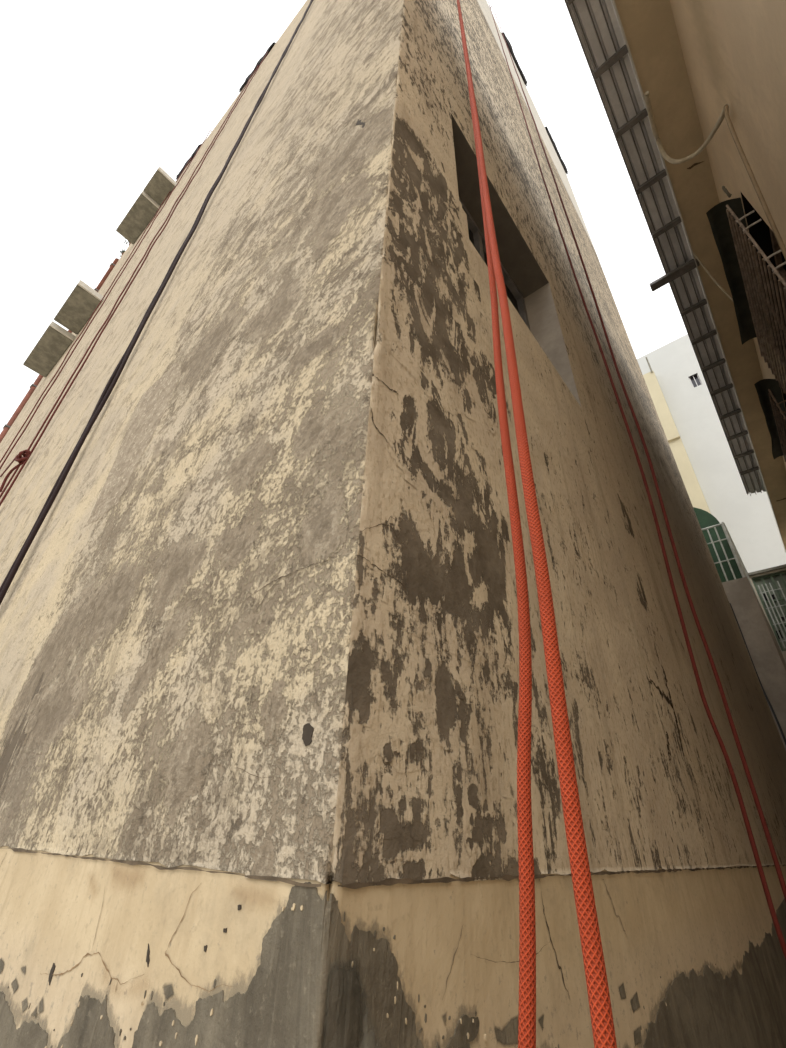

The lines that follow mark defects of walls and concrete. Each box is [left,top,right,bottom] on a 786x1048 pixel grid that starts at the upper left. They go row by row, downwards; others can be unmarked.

crack [0,848,786,1000]